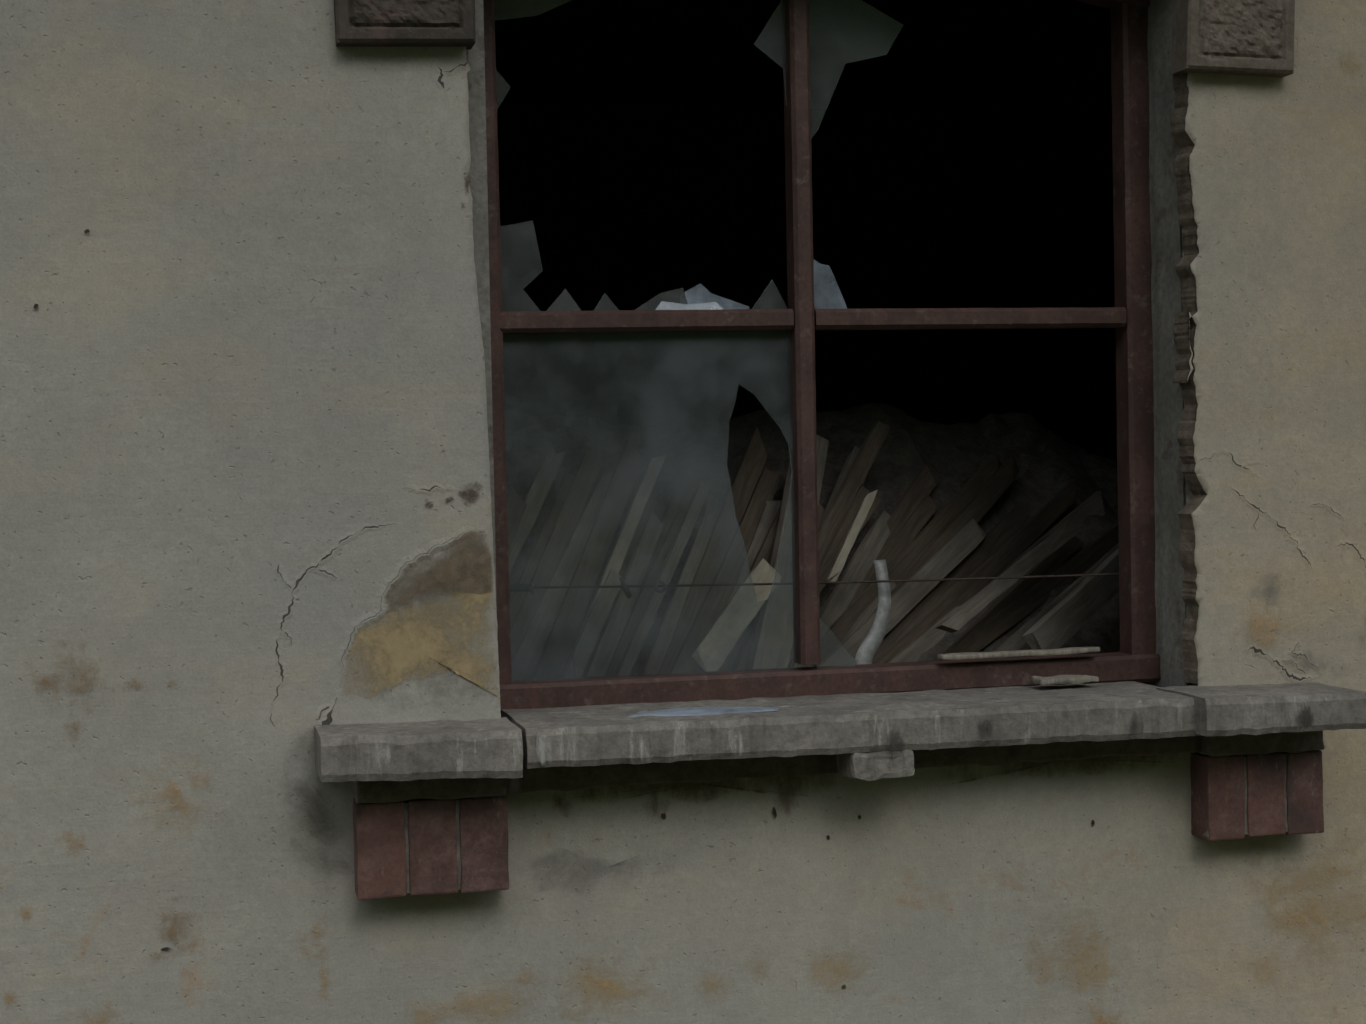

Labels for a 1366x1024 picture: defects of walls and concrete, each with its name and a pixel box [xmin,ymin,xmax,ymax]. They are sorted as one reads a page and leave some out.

crack [1199,447,1366,573]
crack [268,522,397,727]
crack [1240,638,1324,683]